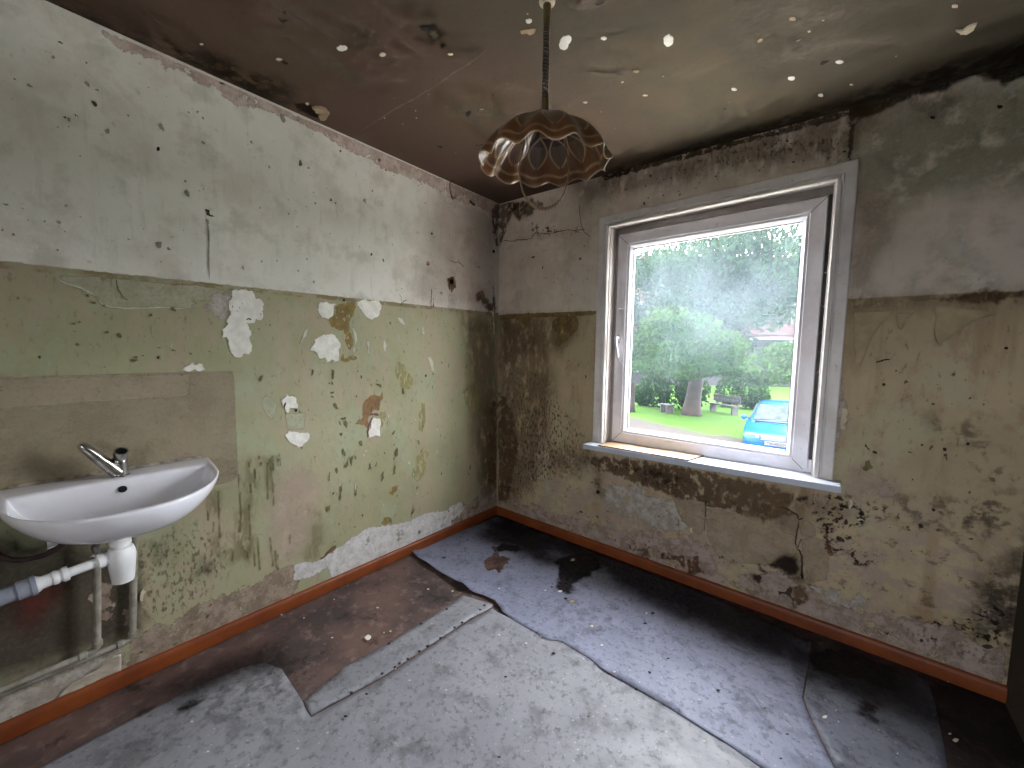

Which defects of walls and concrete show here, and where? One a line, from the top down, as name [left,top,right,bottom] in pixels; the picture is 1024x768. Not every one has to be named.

peeling [102,30,499,219]
leakage [602,44,1024,181]
leakage [492,198,543,246]
crack [501,224,582,258]
peeling [0,488,497,723]
leakage [238,459,280,535]
leakage [486,393,519,501]
leakage [483,519,1024,768]
peeling [512,484,1007,683]
crack [781,507,804,580]